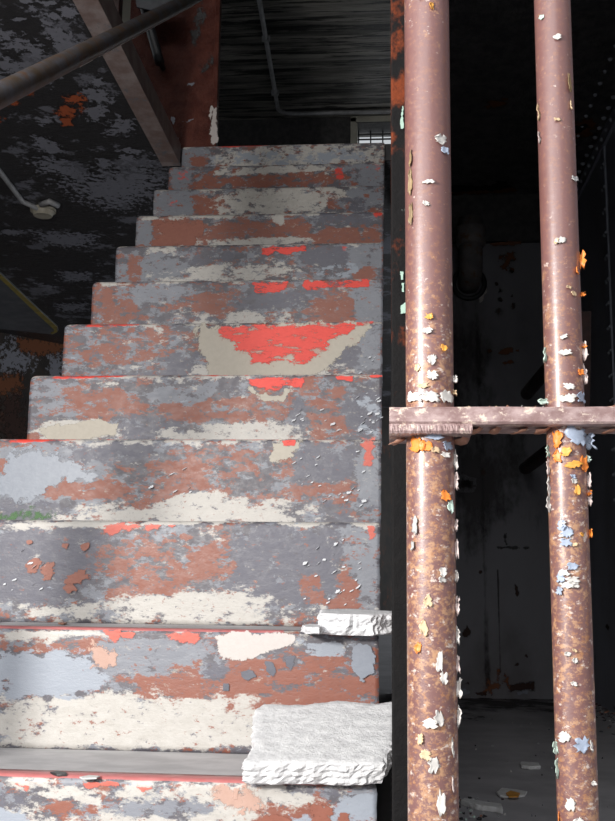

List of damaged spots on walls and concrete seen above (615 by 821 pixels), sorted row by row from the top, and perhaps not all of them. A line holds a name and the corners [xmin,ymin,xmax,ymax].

peeling [0,228,106,250]
peeling [33,269,99,293]
peeling [0,334,63,378]
peeling [39,418,119,439]
peeling [0,444,99,504]
peeling [25,558,55,590]
peeling [63,569,91,594]
peeling [215,624,324,681]
peeling [350,643,376,682]
peeling [307,802,353,821]